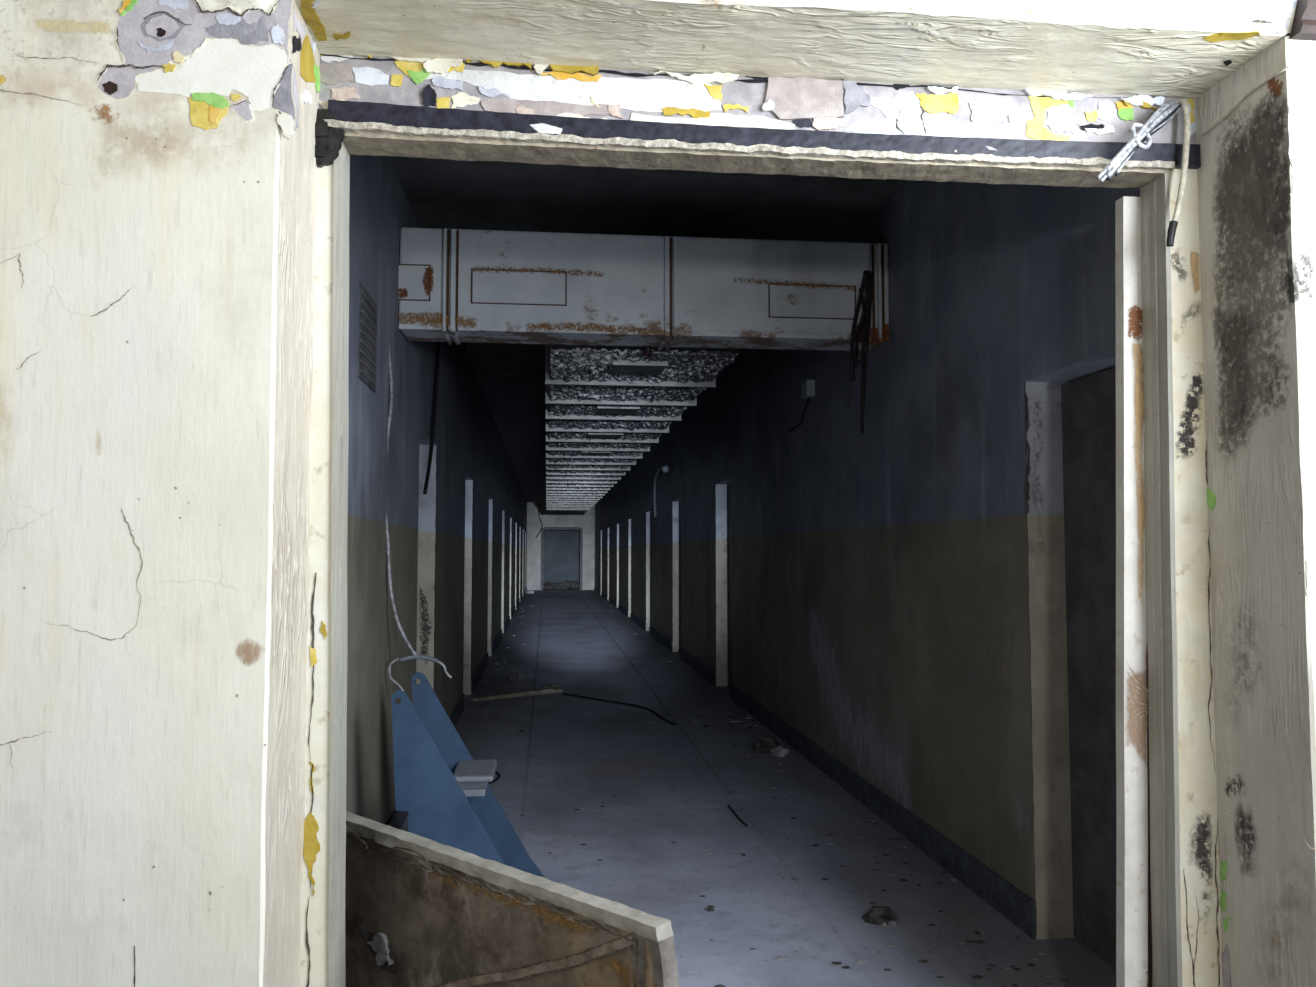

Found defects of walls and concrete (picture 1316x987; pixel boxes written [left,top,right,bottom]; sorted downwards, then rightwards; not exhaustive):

flaking render [96,0,795,139]
peeling [812,80,1165,141]
flaking render [1288,106,1310,180]
corrosion [423,267,433,295]
corrosion [398,288,476,327]
corrosion [527,322,660,334]
water stain [1215,99,1316,454]
corrosion [1128,305,1145,586]
water stain [1179,376,1203,454]
crack [41,509,143,640]
corrosion [1126,646,1148,759]
water stain [1196,818,1212,899]